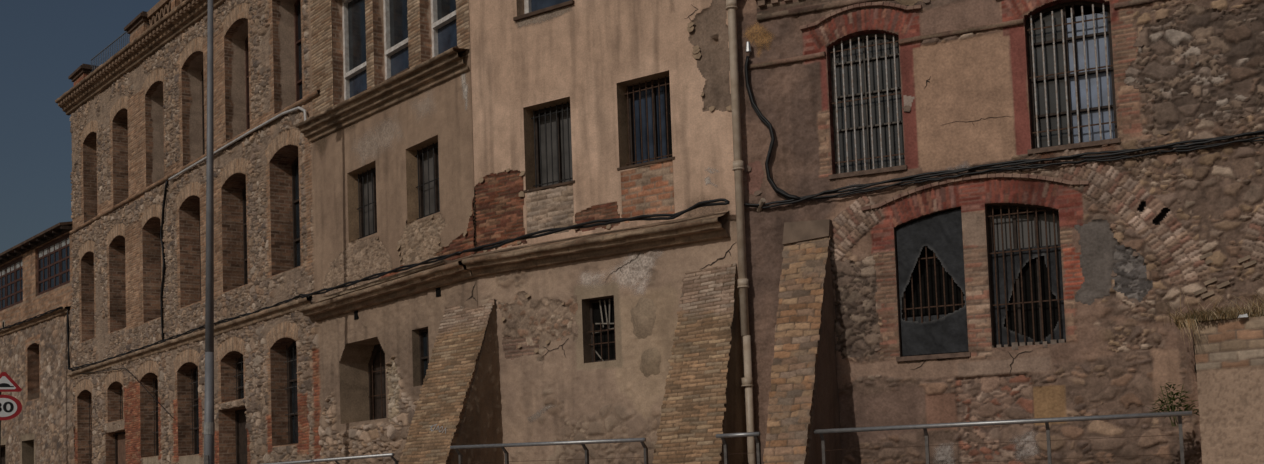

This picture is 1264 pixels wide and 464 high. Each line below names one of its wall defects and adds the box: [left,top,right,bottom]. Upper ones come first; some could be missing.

peeling [687,0,732,112]
flaking render [320,160,675,297]
spalling [1137,201,1170,225]